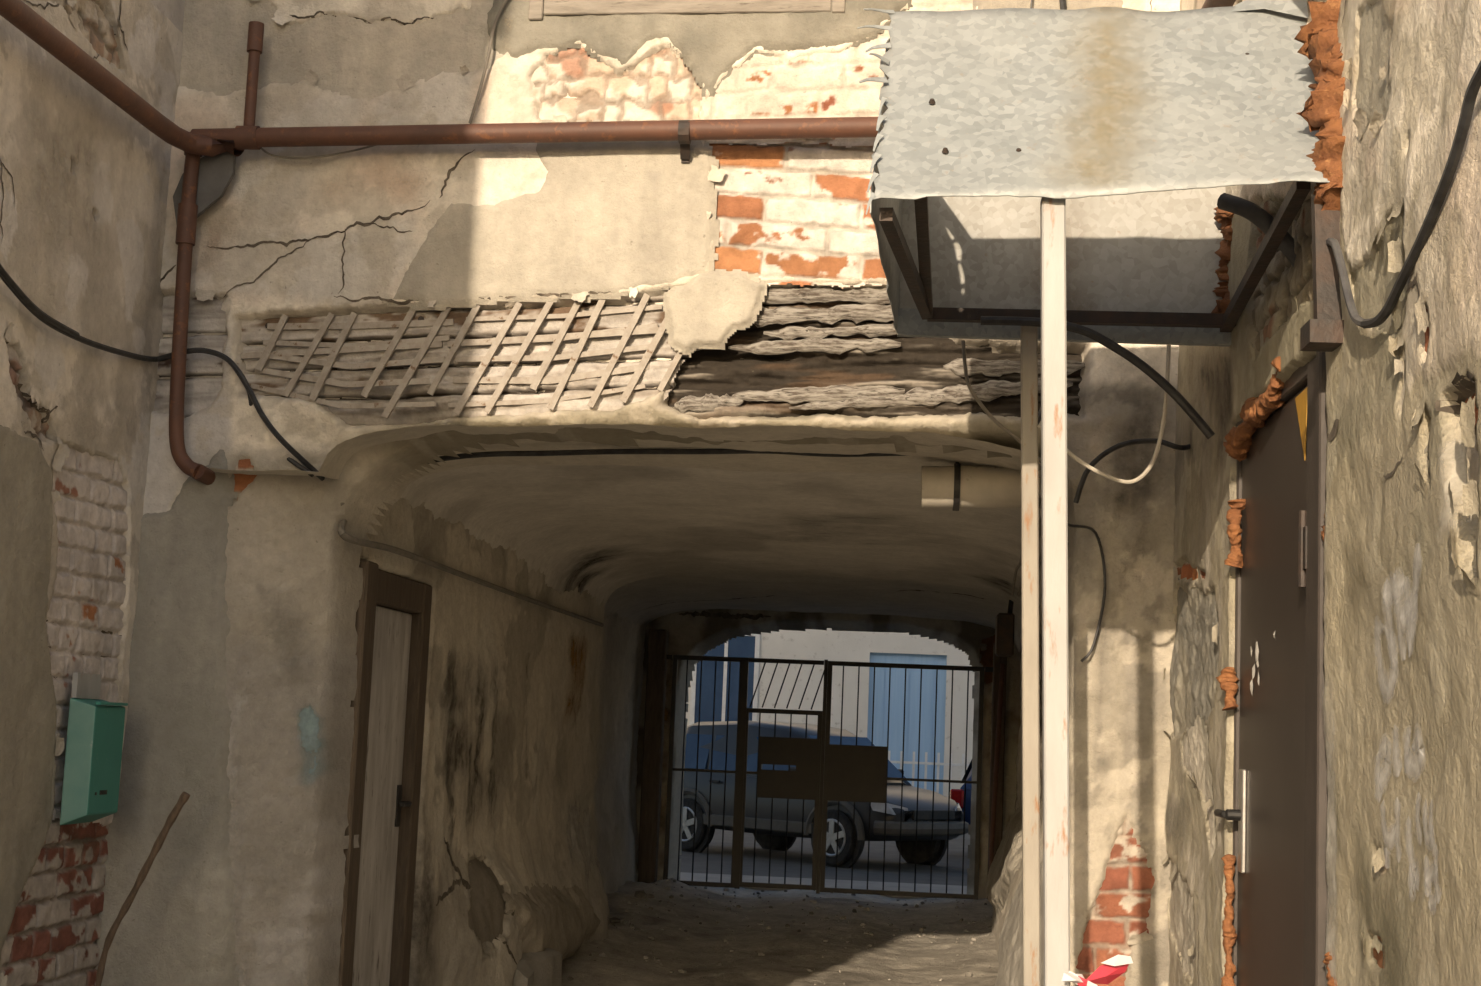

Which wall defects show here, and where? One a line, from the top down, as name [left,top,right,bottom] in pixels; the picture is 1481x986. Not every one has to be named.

crack [290,11,434,25]
flaking render [531,30,890,122]
flaking render [907,0,973,11]
peeling [1343,0,1393,140]
crack [208,150,474,305]
crack [479,291,611,300]
flaking render [663,137,886,357]
peeling [1340,202,1429,430]
spalling [1448,393,1479,595]
flaking render [0,322,128,986]
damp [445,661,496,828]
flaking render [1076,815,1196,986]